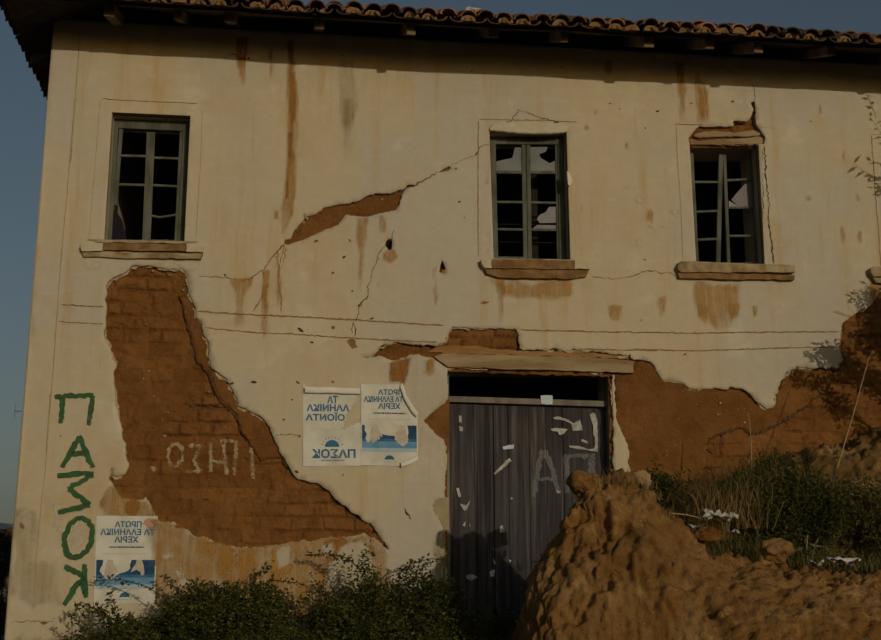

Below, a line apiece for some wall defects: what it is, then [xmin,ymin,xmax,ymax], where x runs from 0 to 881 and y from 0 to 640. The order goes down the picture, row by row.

spalling [688,103,763,149]
crack [414,144,489,186]
spalling [284,186,414,245]
crack [761,146,774,263]
crack [351,231,394,335]
crack [592,270,676,280]
spalling [105,266,388,549]
spalling [367,291,881,513]
spalling [433,497,449,532]